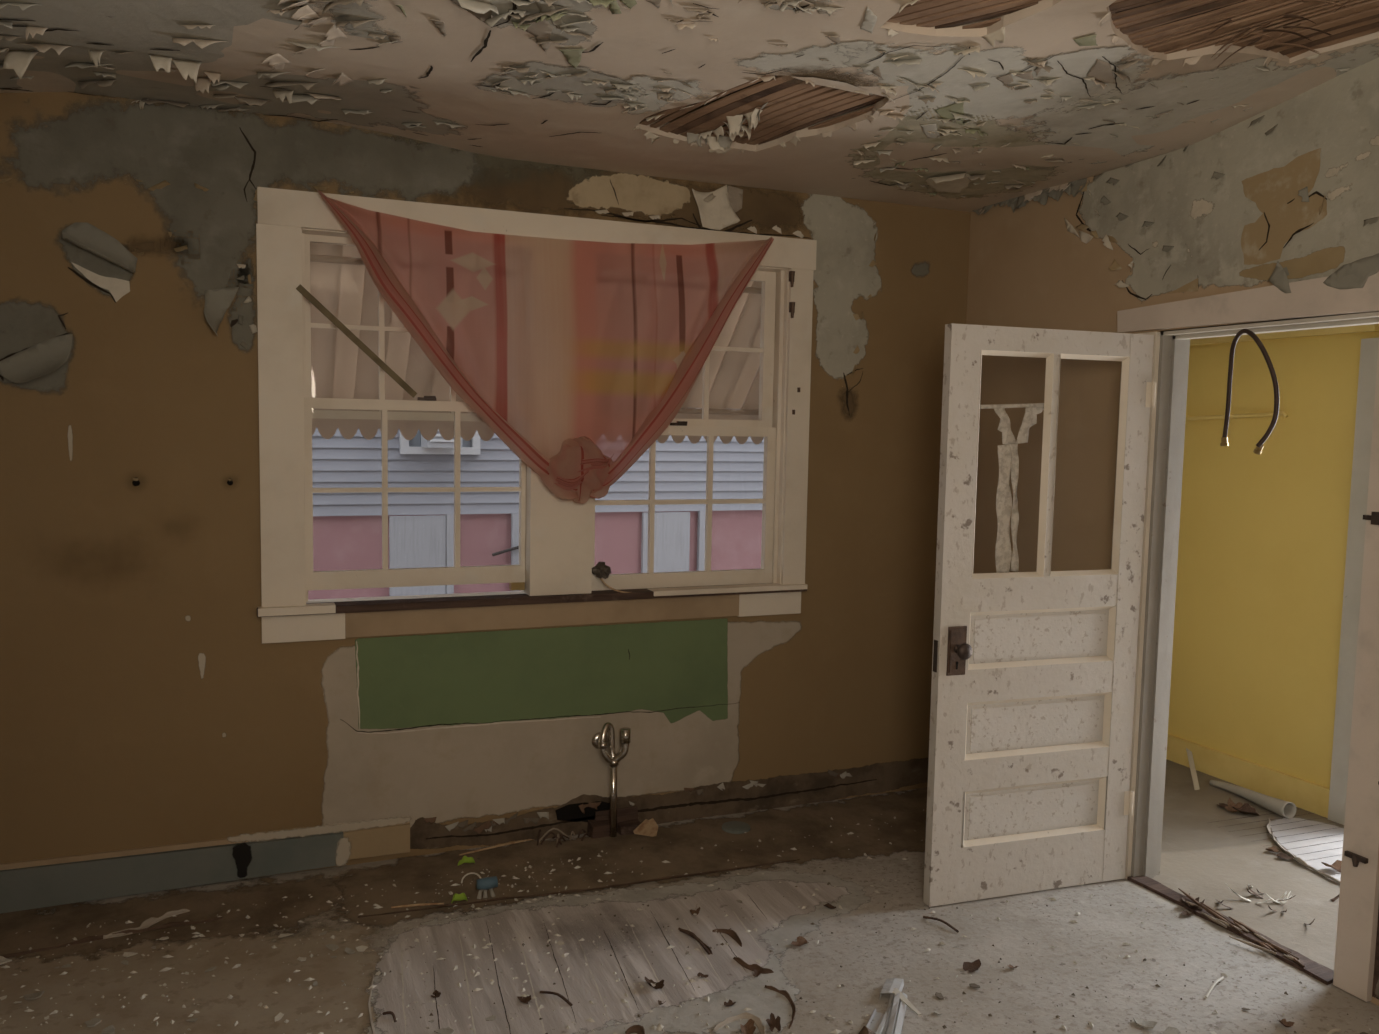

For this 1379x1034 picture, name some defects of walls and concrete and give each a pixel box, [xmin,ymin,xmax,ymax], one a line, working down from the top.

crack [239,127,256,201]
peeling [0,0,506,352]
peeling [450,0,1379,301]
peeling [0,299,75,393]
peeling [801,194,882,379]
spalling [537,801,610,822]